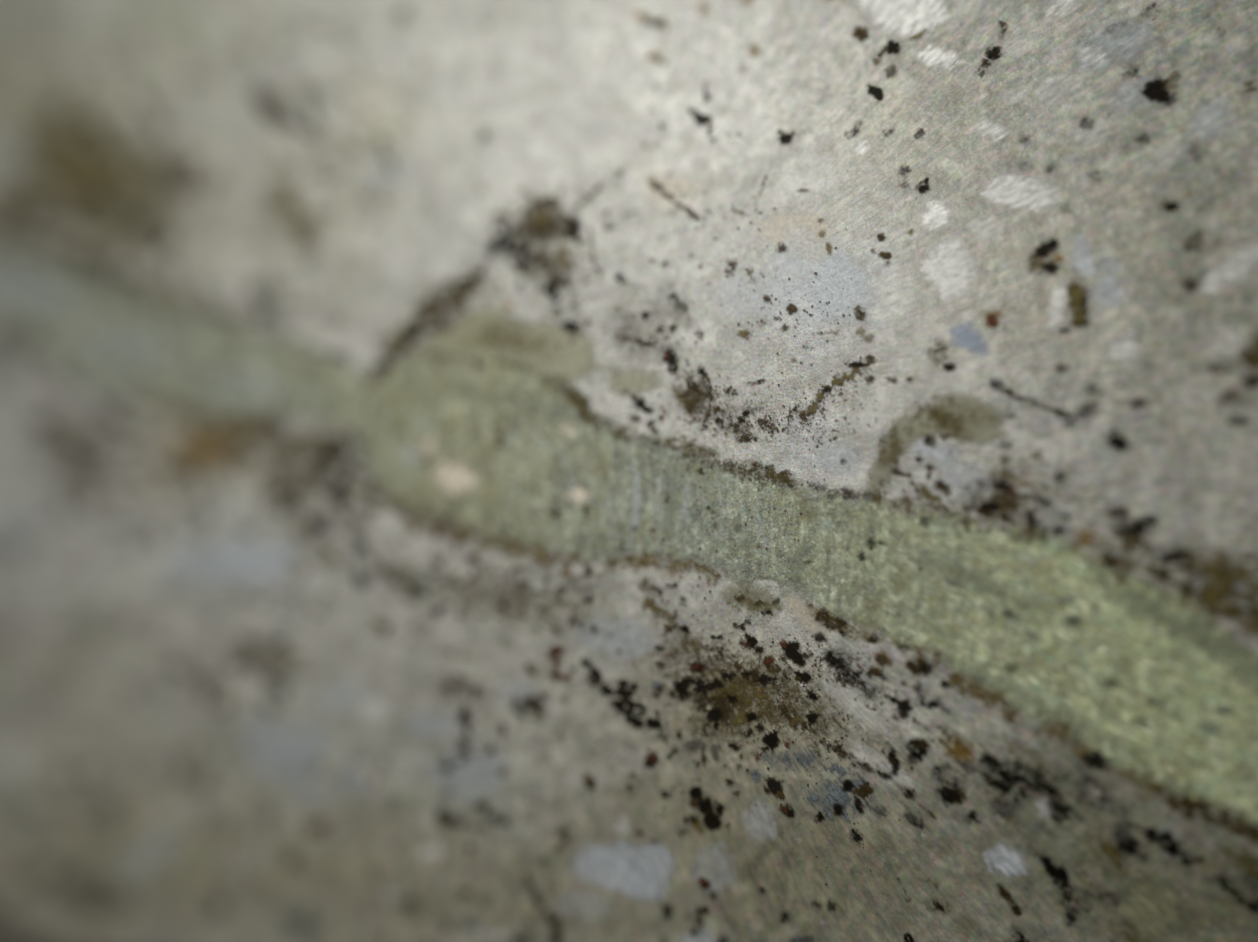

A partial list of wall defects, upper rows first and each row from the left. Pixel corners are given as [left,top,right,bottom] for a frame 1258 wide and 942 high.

leakage [1061,281,1089,333]
leakage [671,367,714,429]
leakage [994,444,1097,549]
leakage [1102,506,1258,633]
leakage [639,579,815,766]
leakage [865,634,908,698]
leakage [901,658,949,711]
leakage [888,738,1125,824]